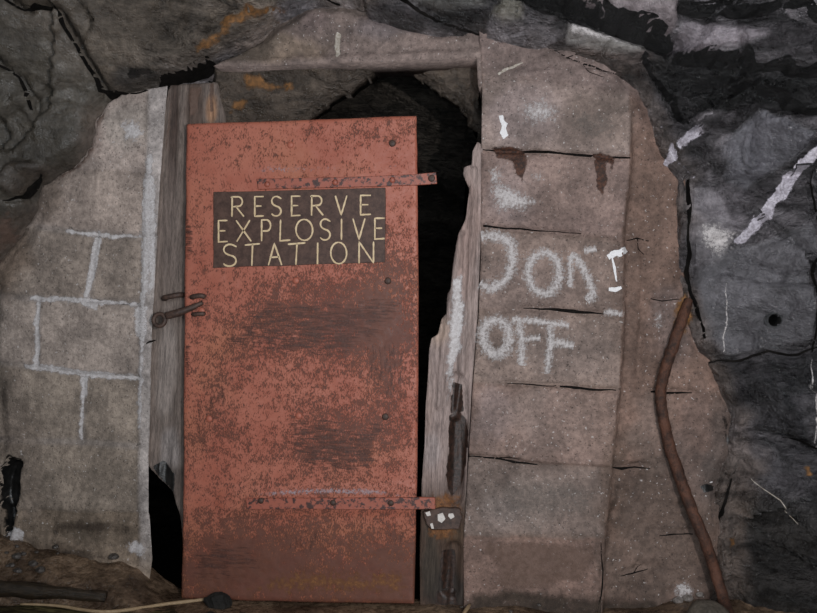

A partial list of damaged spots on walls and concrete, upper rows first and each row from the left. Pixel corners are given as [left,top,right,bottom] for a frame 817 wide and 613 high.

crack [522,150,630,159]
corrosion [494,147,527,177]
corrosion [593,153,615,194]
crack [483,225,581,234]
crack [523,307,604,315]
crack [508,383,616,391]
crack [469,456,538,465]
spalling [0,455,24,536]